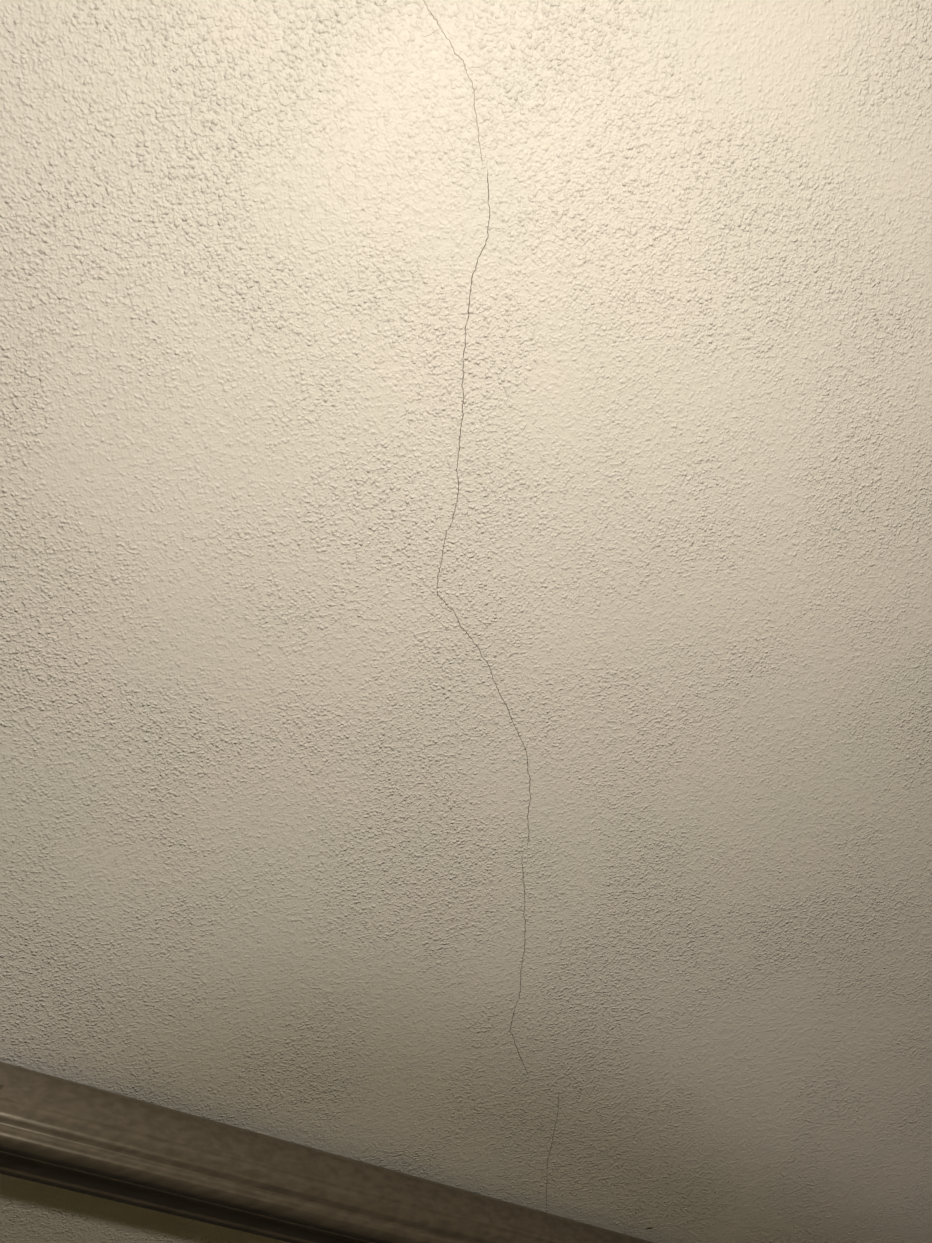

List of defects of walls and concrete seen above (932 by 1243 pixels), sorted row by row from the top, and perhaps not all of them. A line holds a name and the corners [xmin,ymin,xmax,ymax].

crack [423,0,531,1073]